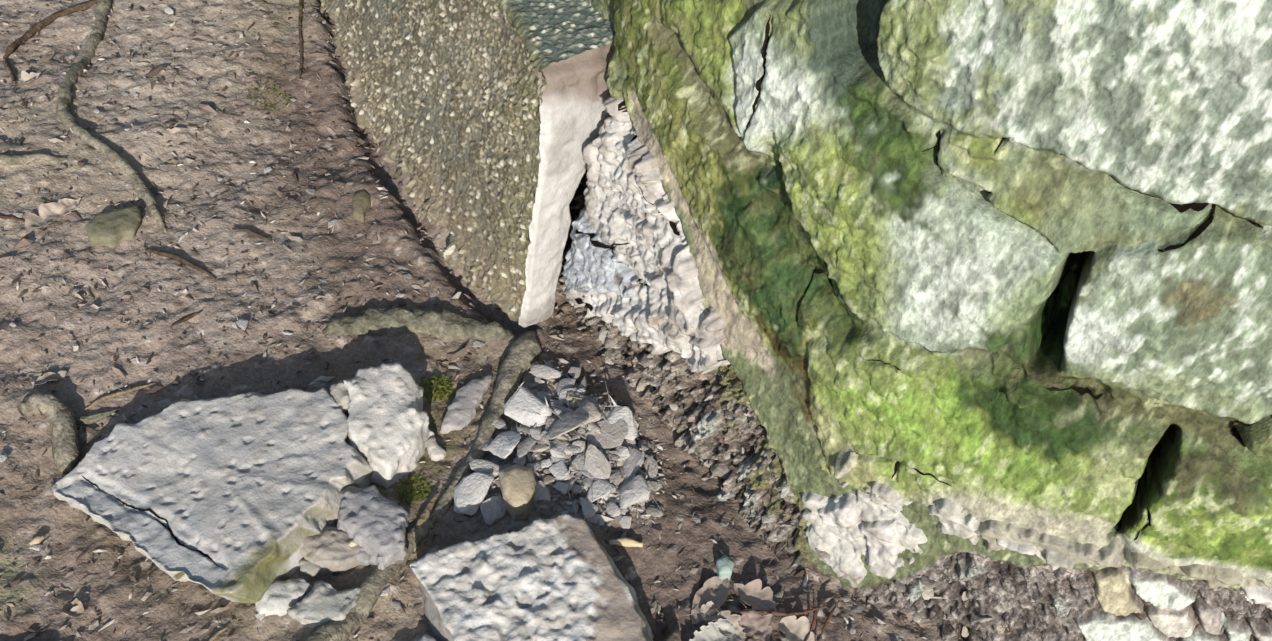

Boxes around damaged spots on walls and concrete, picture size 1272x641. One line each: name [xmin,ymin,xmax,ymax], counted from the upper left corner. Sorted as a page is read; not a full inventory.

crack [743,15,771,139]
crack [1111,176,1263,252]